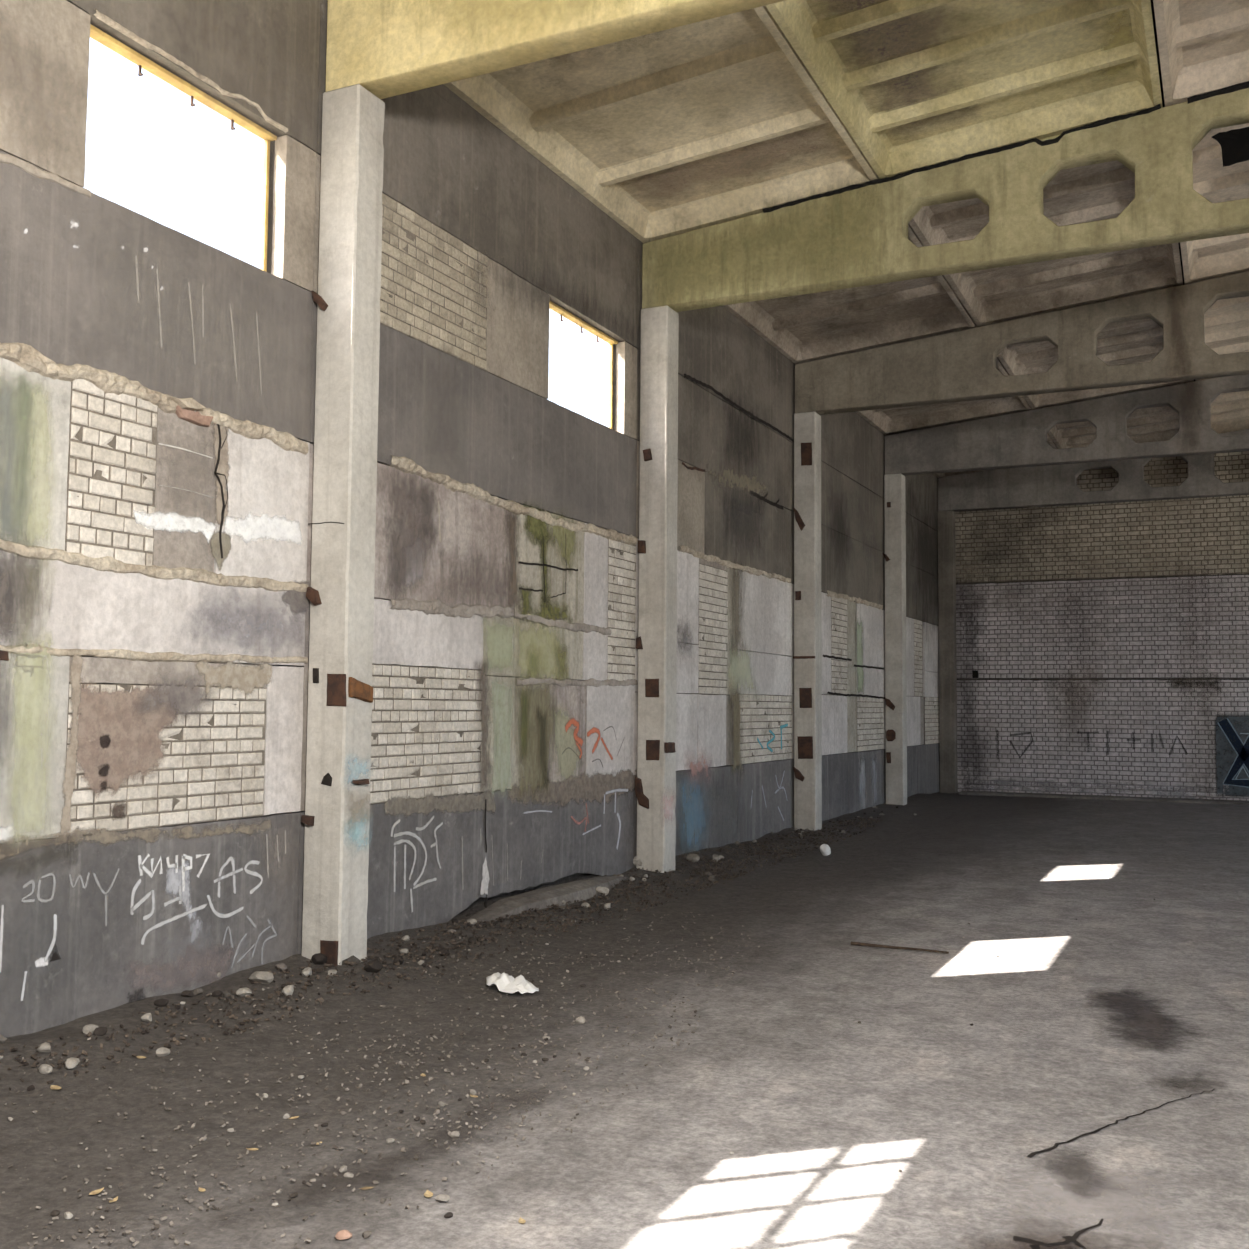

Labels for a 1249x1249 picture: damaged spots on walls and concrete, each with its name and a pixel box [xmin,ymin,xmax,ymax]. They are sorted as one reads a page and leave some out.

crack [684,374,794,442]
spalling [0,343,310,613]
crack [682,462,706,472]
crack [750,490,783,510]
flaking render [0,644,319,860]